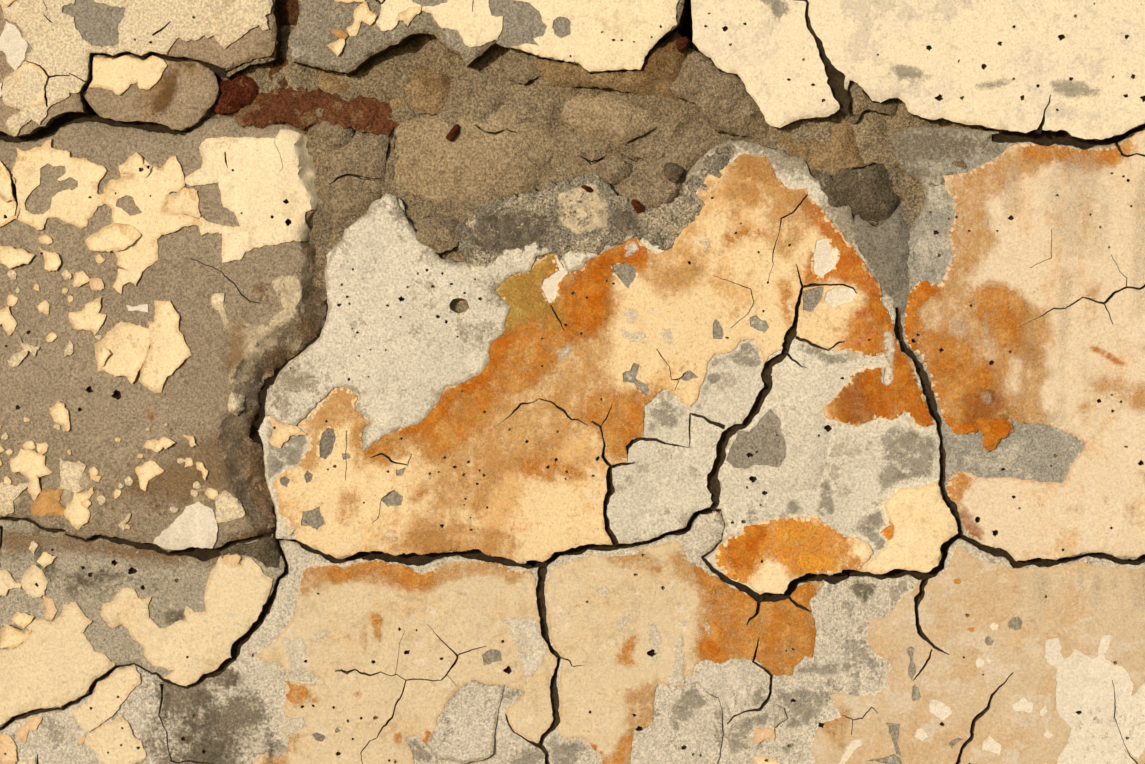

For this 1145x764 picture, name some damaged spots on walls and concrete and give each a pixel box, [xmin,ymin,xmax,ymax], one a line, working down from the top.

crack [11,178,19,207]
peeling [0,138,202,400]
crack [0,25,226,143]
spalling [205,0,984,328]
corrosion [725,140,1131,452]
crack [991,98,1145,157]
peeling [0,423,326,568]
corrosion [300,237,703,593]
crack [0,195,1145,764]
corrosion [674,517,861,676]
peeling [71,665,146,764]
corrosion [590,685,652,764]